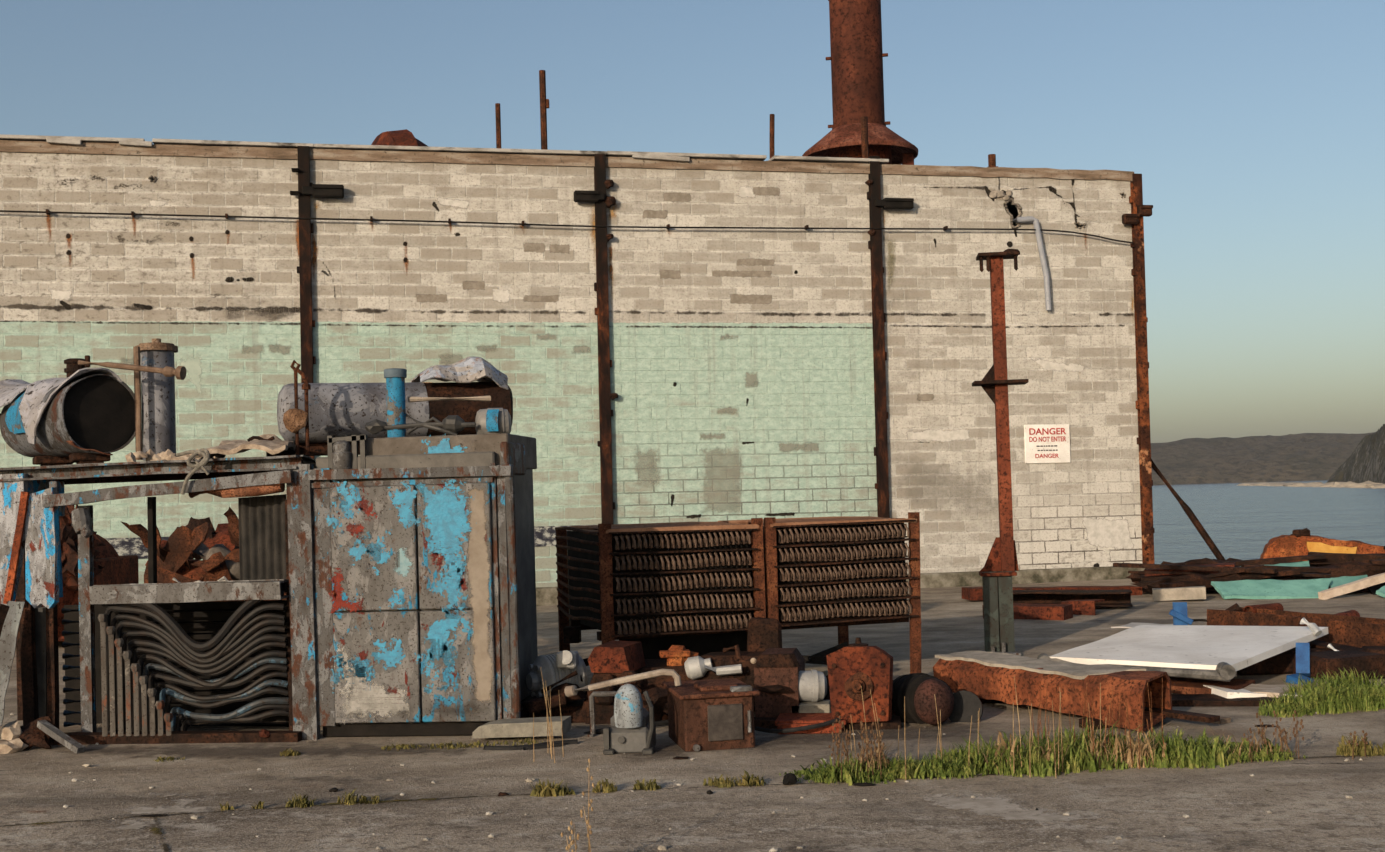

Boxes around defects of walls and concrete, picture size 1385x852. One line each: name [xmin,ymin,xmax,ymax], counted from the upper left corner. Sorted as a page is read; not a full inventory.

crack [924,177,1080,223]
corrosion [296,219,317,276]